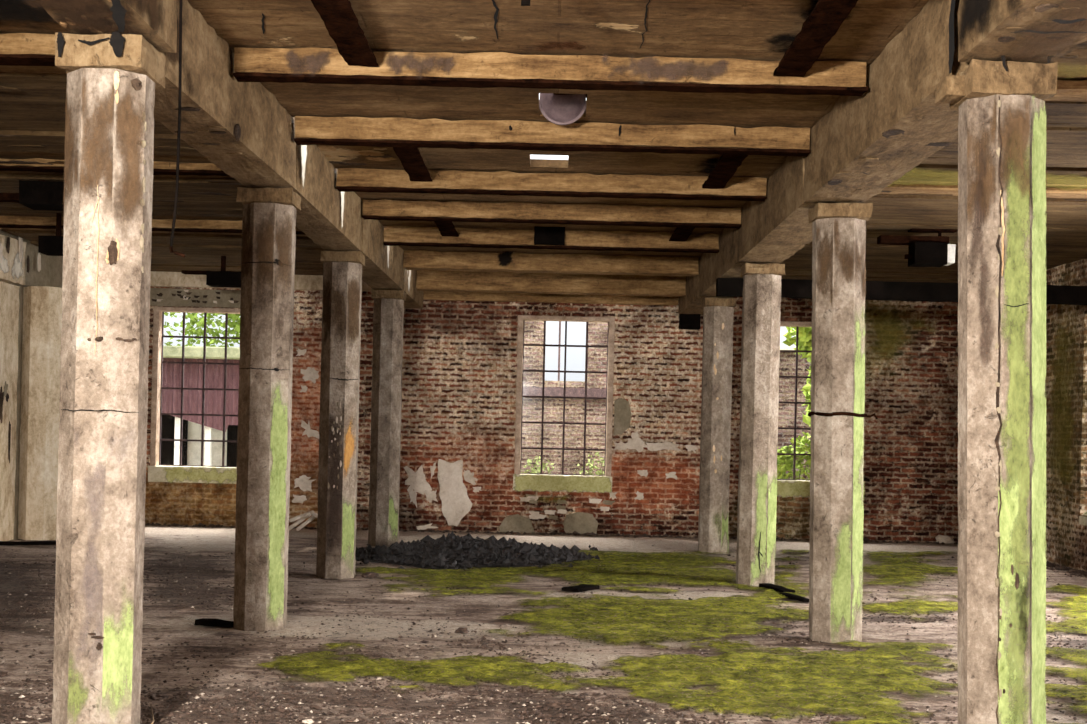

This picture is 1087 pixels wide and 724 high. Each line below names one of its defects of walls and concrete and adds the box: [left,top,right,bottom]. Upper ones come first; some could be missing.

crack [491,0,499,39]
crack [640,0,650,48]
corrosion [344,423,355,474]
peeling [613,398,697,452]
water stain [892,100,1087,724]
water stain [268,386,288,619]
peeling [404,459,481,530]
peeling [499,492,617,534]
water stain [767,478,777,568]